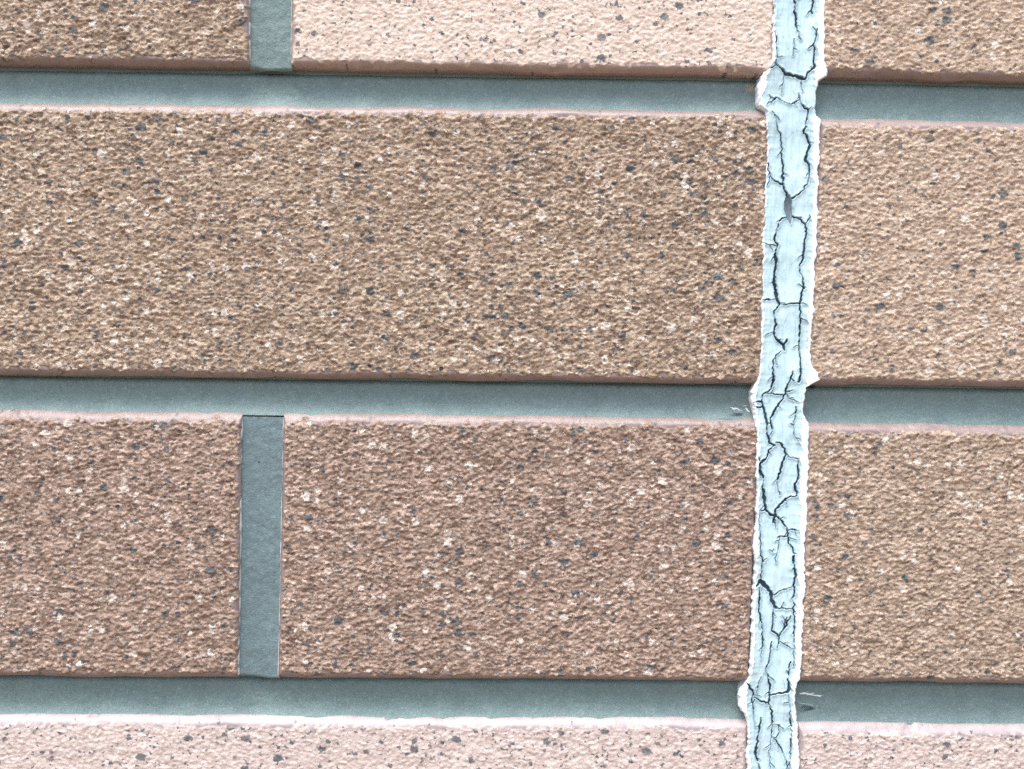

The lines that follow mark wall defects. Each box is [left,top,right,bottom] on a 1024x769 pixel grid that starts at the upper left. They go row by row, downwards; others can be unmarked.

crack [746,0,818,769]